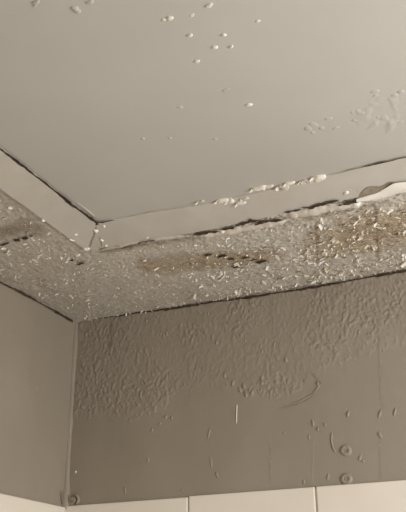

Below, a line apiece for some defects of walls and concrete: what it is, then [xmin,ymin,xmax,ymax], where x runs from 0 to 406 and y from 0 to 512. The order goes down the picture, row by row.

peeling [213,175,326,207]
peeling [0,182,406,321]
crack [193,200,359,236]
leakage [315,210,406,254]